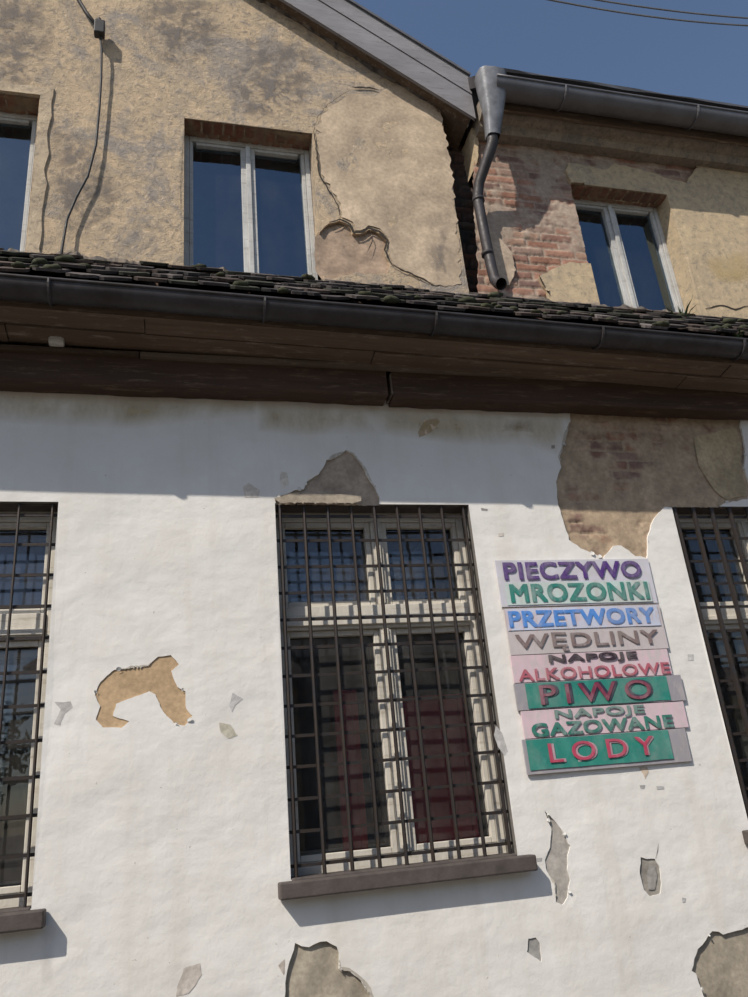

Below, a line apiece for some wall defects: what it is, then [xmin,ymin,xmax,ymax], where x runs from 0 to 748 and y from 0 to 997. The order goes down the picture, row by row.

spalling [314,223,389,280]
flaking render [472,141,698,305]
peeling [243,483,260,497]
spalling [274,450,379,512]
flaking render [551,413,748,558]
peeling [94,655,192,728]
peeling [545,813,571,904]
peeling [640,849,661,896]
spalling [278,941,374,997]
spalling [692,927,748,997]